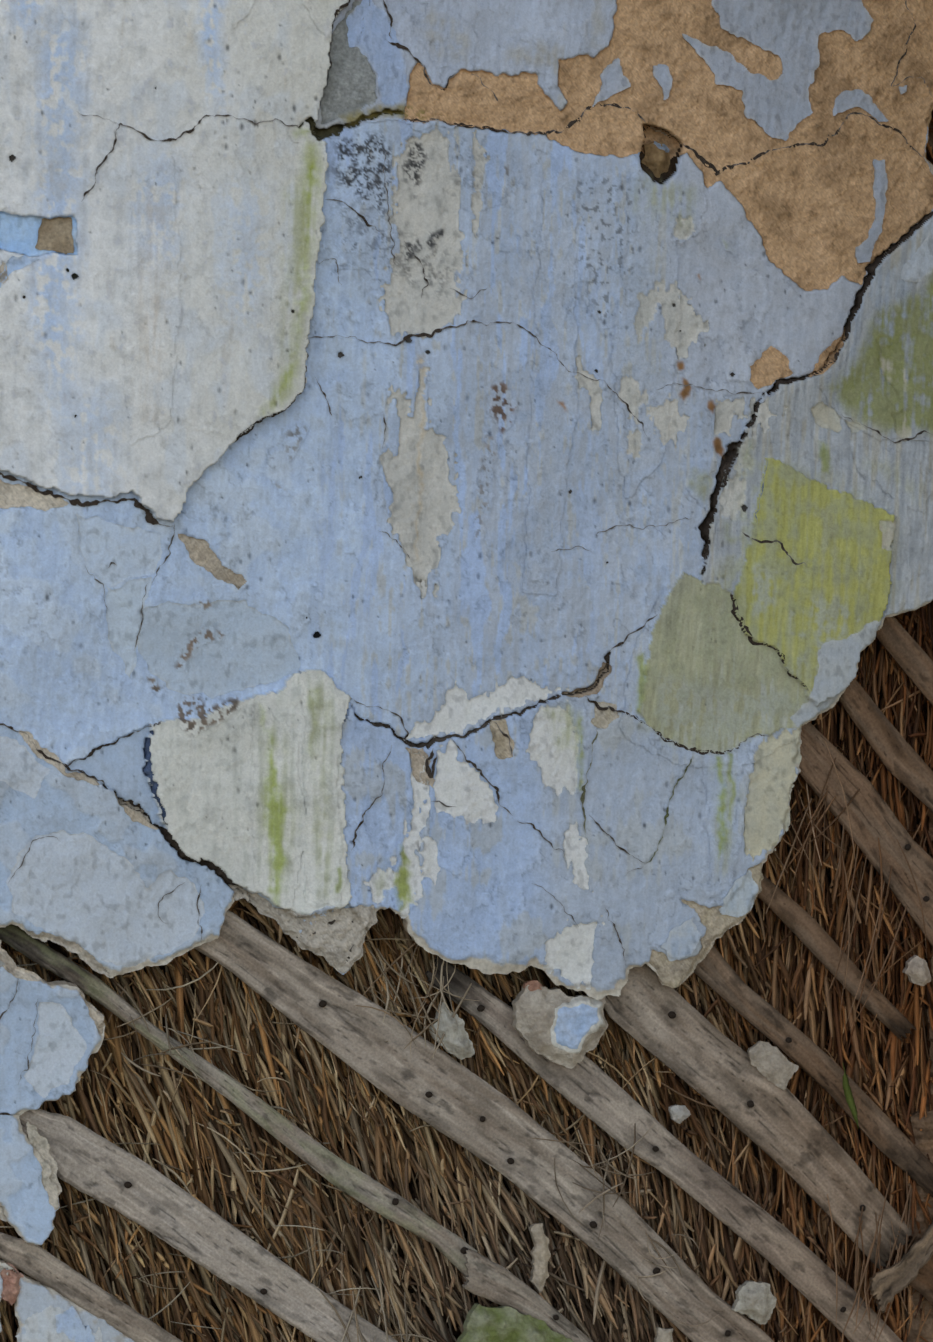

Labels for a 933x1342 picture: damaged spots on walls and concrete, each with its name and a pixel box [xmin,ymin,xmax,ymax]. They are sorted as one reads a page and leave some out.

peeling [0,199,77,288]
crack [78,74,645,202]
crack [234,151,647,443]
peeling [320,0,933,598]
crack [551,211,933,574]
crack [0,472,175,651]
peeling [0,479,301,739]
peeling [6,830,205,977]
crack [0,722,243,939]
peeling [228,662,619,973]
crack [352,614,765,872]
flaking render [649,620,882,988]